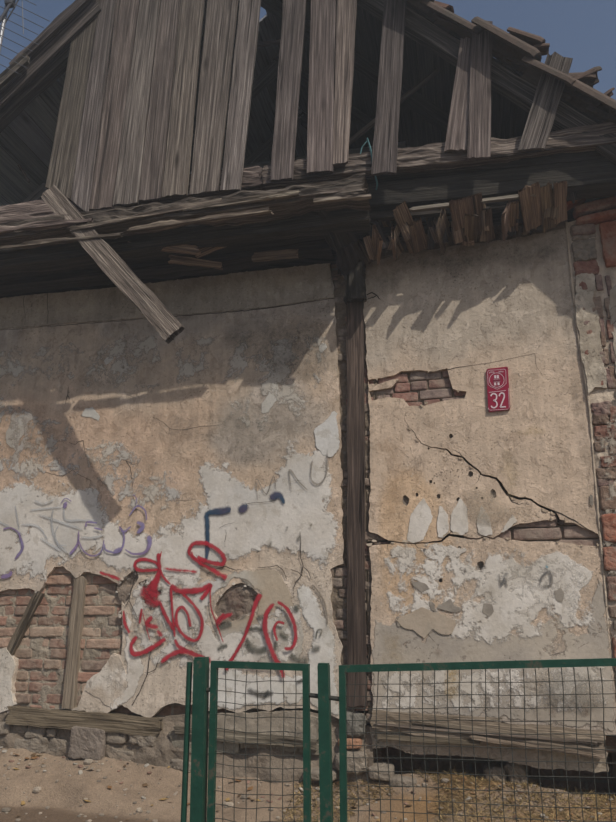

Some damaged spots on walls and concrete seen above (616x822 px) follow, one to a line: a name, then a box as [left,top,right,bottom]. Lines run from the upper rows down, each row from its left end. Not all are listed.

peeling [222,337,327,430]
flaking render [364,368,466,407]
crack [404,416,598,535]
peeling [0,398,340,716]
crack [366,531,487,548]
peeling [372,487,615,732]
peeling [369,726,609,773]